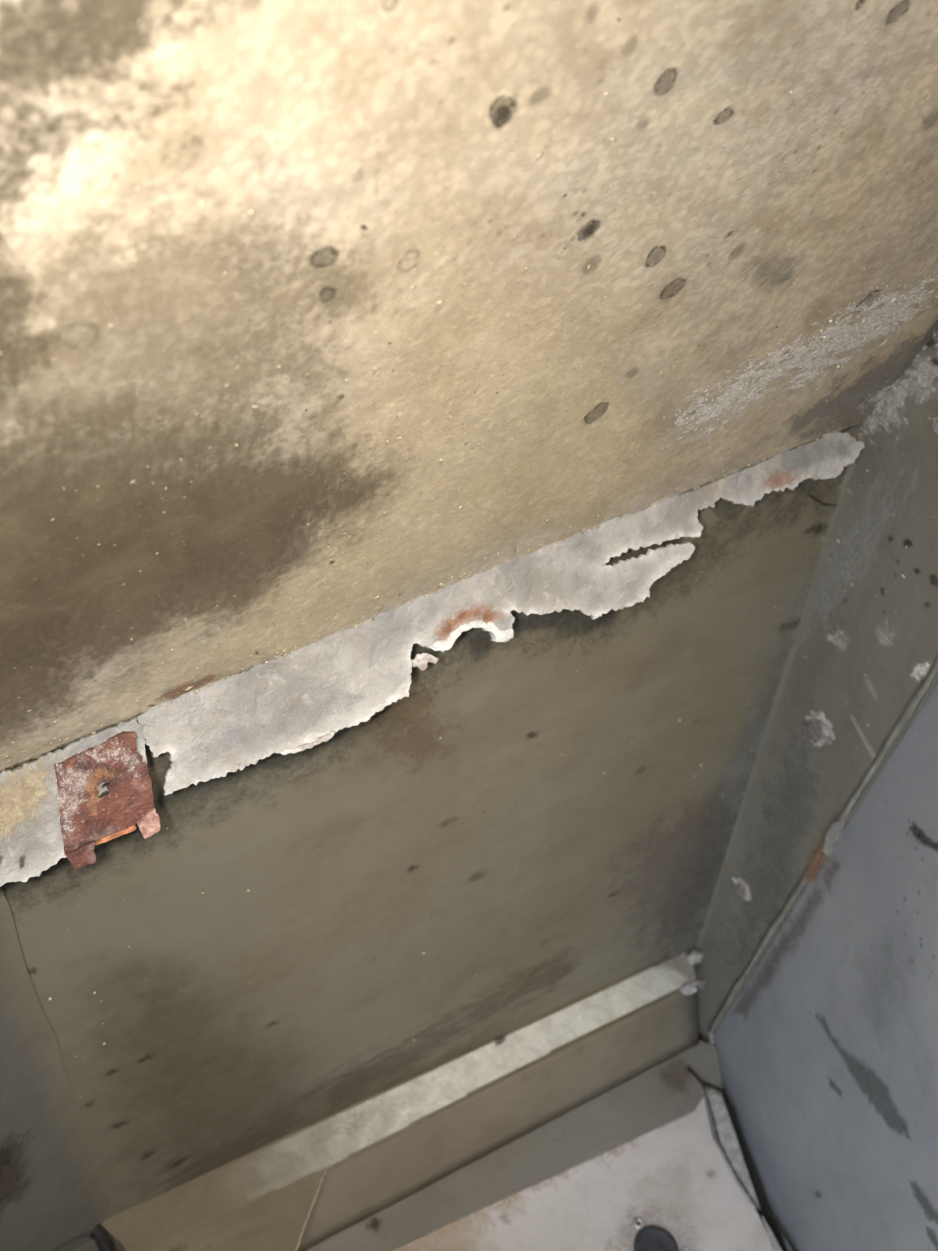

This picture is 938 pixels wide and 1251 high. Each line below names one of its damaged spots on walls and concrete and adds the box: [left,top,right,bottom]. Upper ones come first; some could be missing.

leakage [0,0,184,207]
leakage [490,96,516,127]
leakage [0,227,654,740]
corrosion [0,431,865,886]